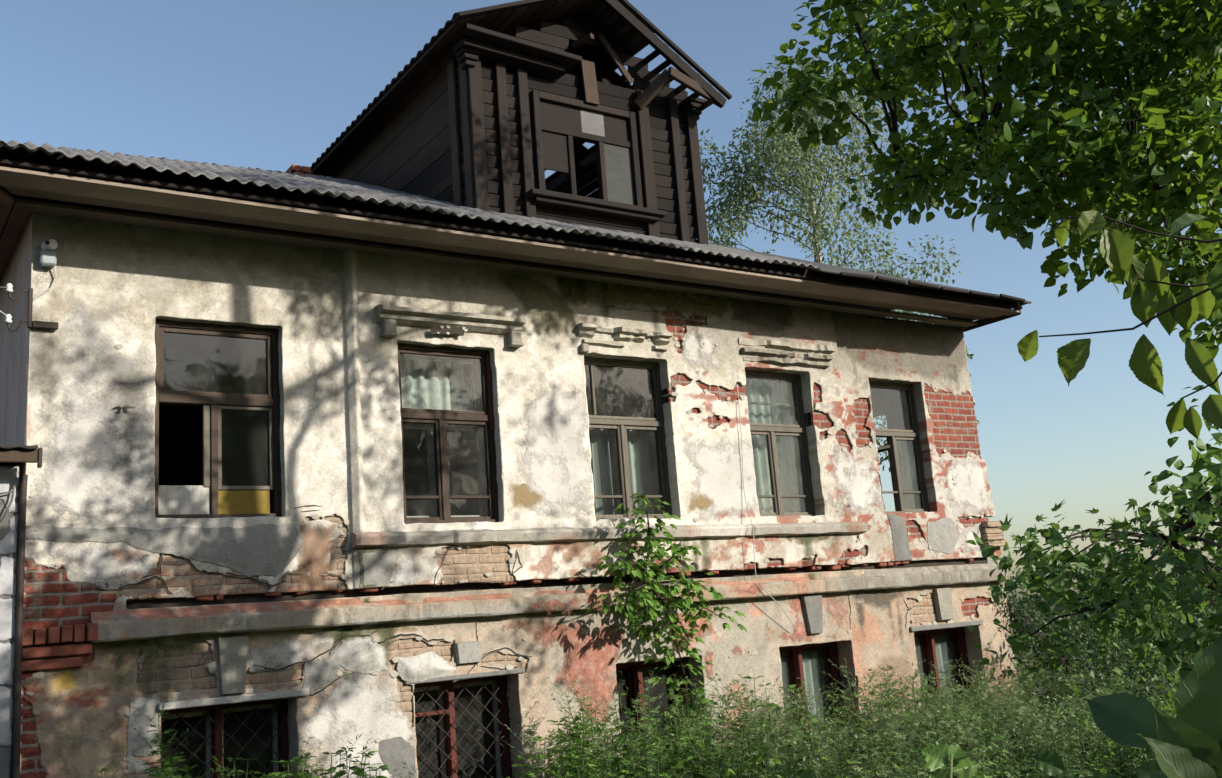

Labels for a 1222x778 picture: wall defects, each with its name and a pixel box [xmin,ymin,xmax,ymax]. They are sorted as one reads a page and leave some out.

peeling [29,312,154,530]
peeling [517,390,593,521]
peeling [661,307,759,522]
peeling [810,383,884,516]
spalling [924,383,989,562]
spalling [23,514,378,629]
peeling [393,558,417,586]
spalling [432,544,541,590]
spalling [738,536,909,581]
peeling [20,640,219,778]
peeling [245,636,457,778]
peeling [502,577,624,724]